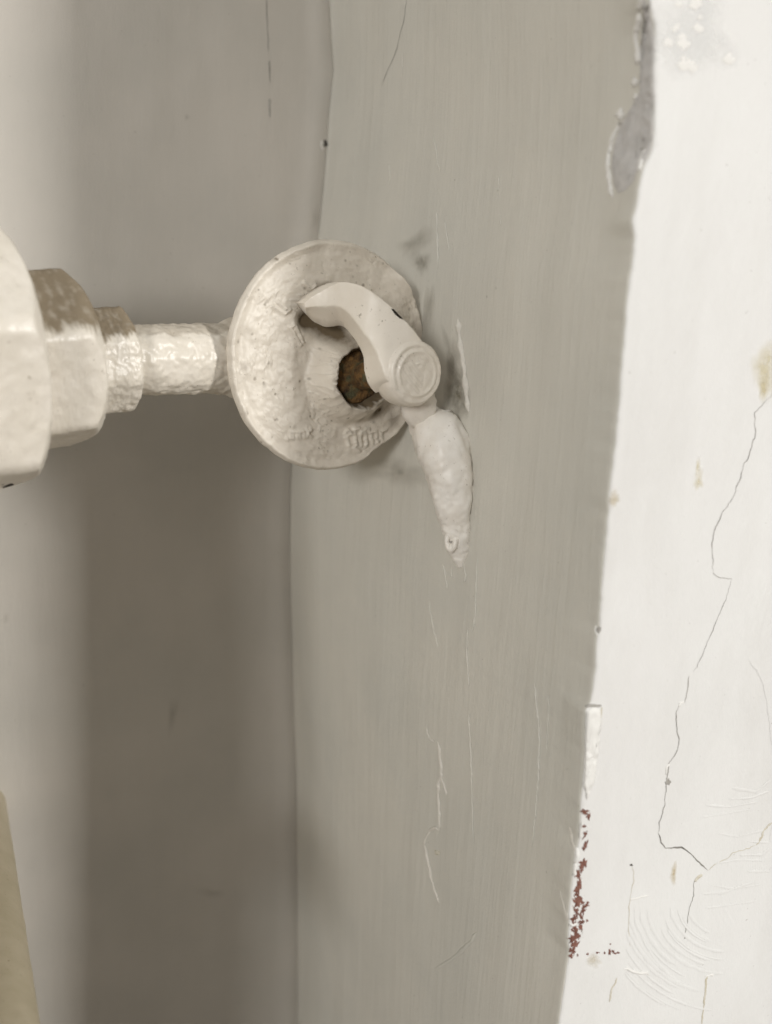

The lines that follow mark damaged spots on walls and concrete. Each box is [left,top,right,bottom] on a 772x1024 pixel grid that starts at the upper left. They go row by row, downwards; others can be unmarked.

flaking render [605,0,655,198]
crack [658,396,772,939]
crack [701,974,714,1024]